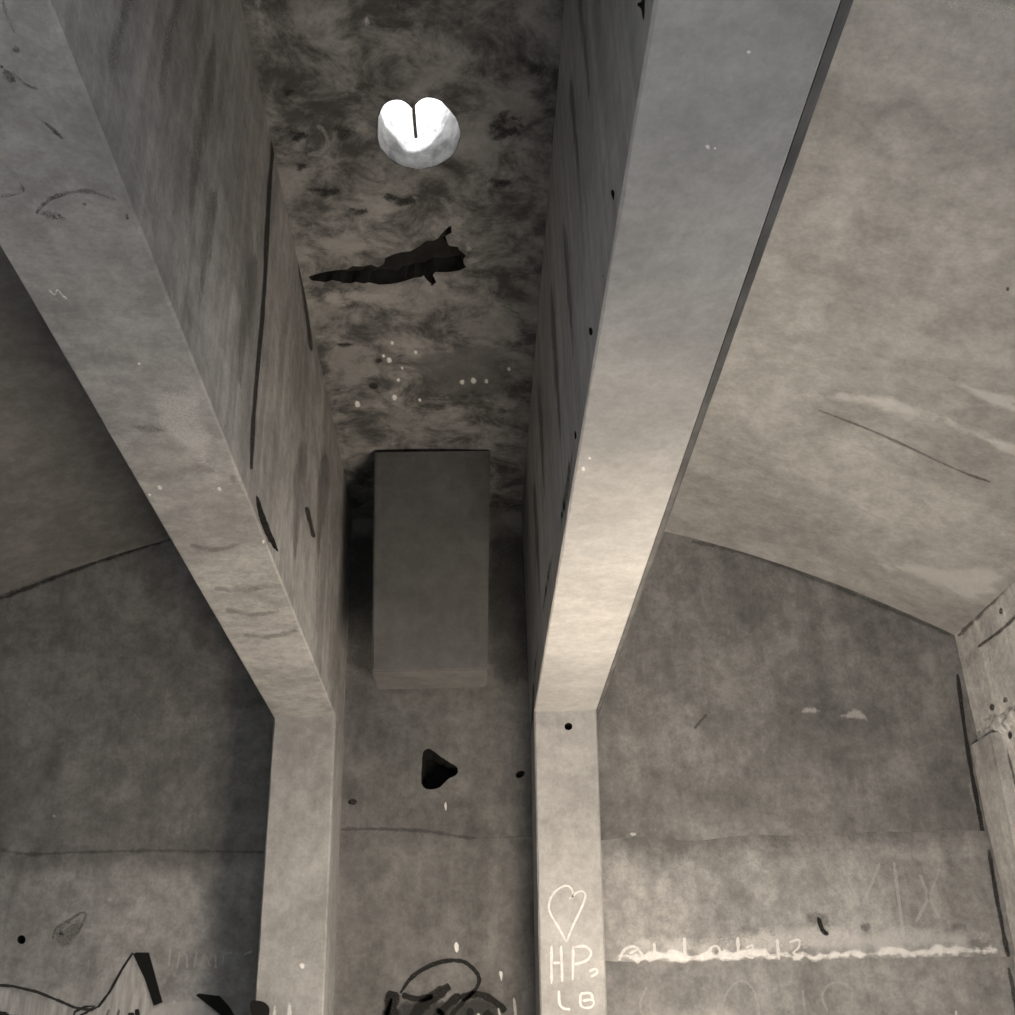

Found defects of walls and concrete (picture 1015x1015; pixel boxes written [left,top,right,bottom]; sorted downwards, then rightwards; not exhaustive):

crack [819,410,990,482]